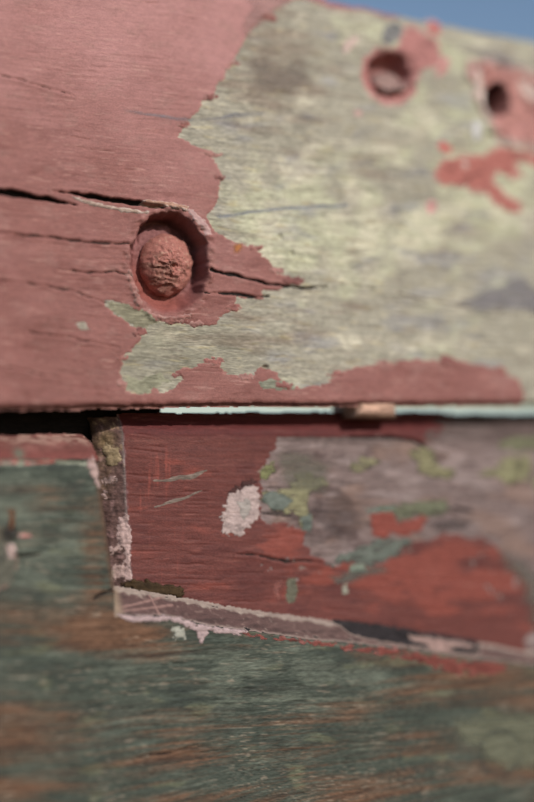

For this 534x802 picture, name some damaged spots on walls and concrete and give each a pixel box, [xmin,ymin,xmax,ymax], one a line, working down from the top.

peeling [360,19,451,107]
peeling [432,58,534,214]
crack [0,189,189,214]
crack [0,232,129,245]
crack [27,270,133,304]
peeling [269,267,304,286]
peeling [219,478,293,537]
peeling [369,511,429,539]
peeling [285,578,298,603]
peeling [243,619,507,677]